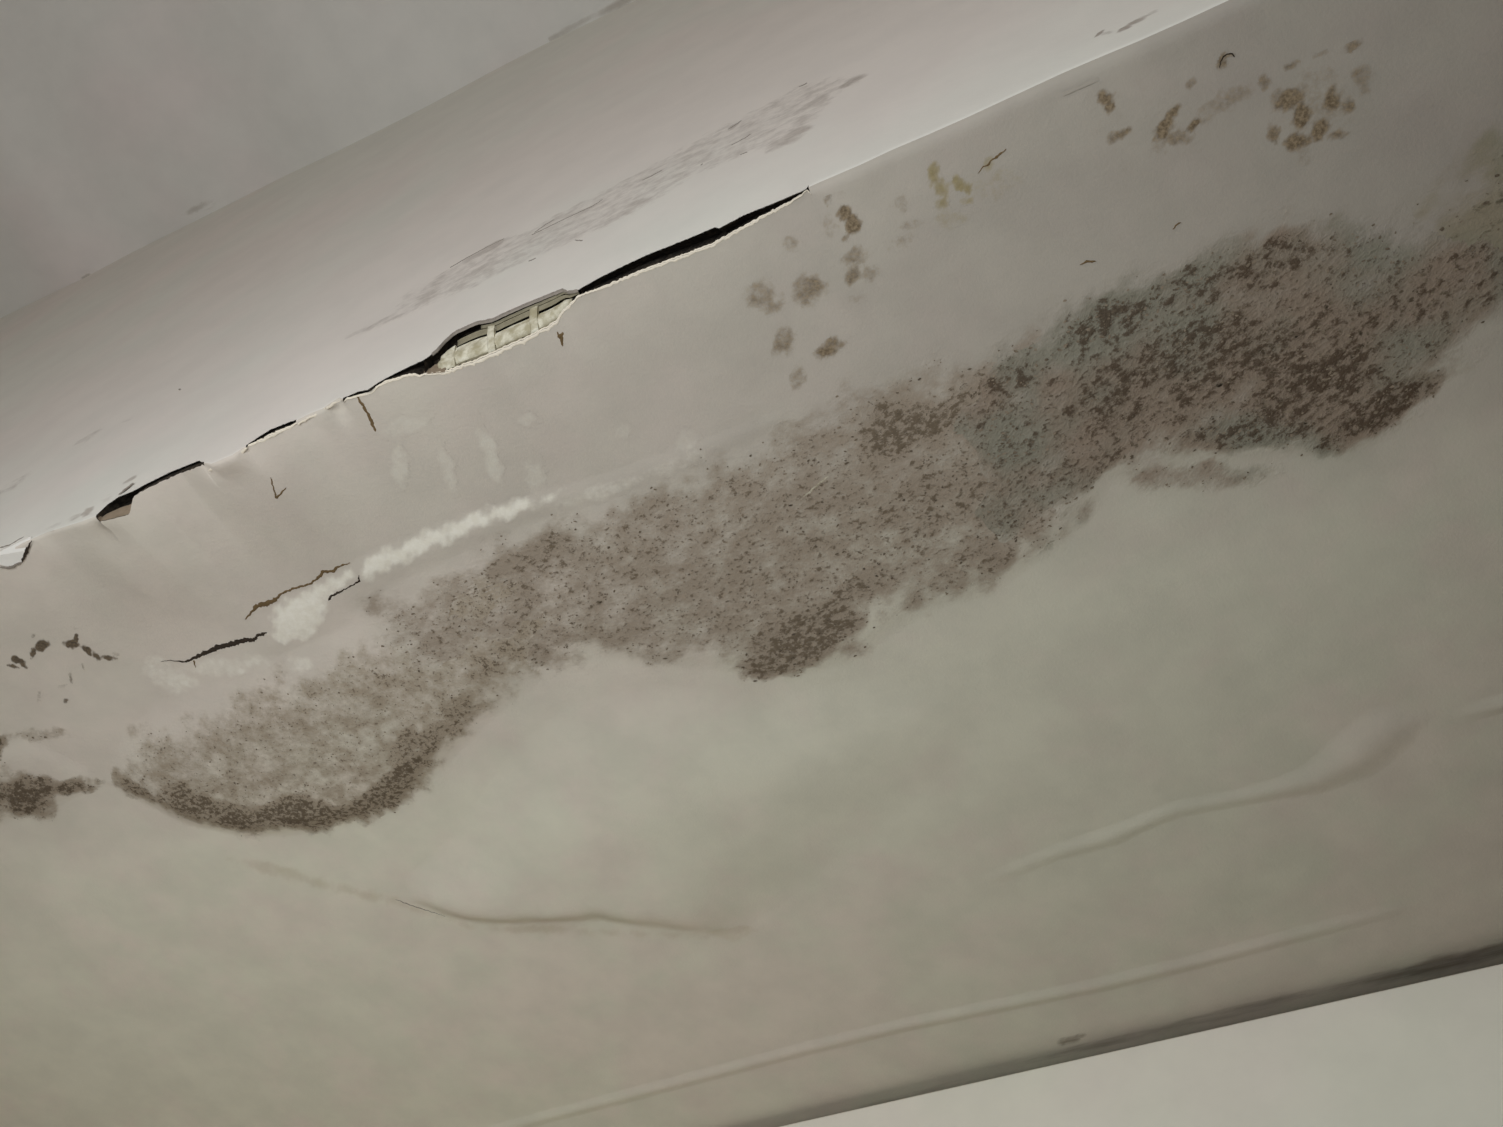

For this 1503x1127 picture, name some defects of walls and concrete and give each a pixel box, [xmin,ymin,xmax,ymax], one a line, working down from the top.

spalling [423,288,586,375]
water stain [0,118,1503,846]
crack [161,563,360,668]